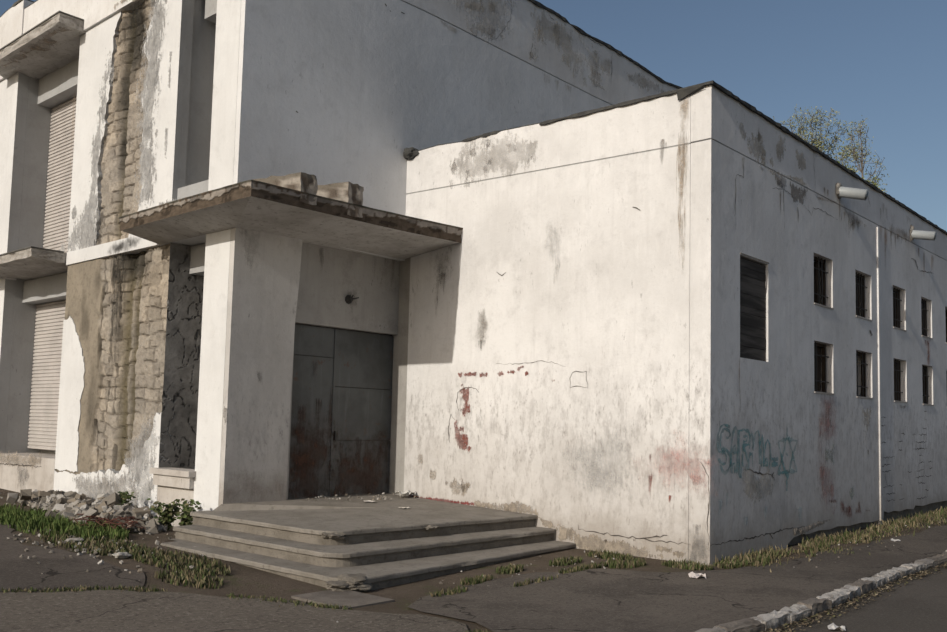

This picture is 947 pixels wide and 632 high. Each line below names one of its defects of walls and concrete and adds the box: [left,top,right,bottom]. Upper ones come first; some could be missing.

flaking render [55,0,463,506]
rust [289,423,388,498]
crack [578,463,805,546]